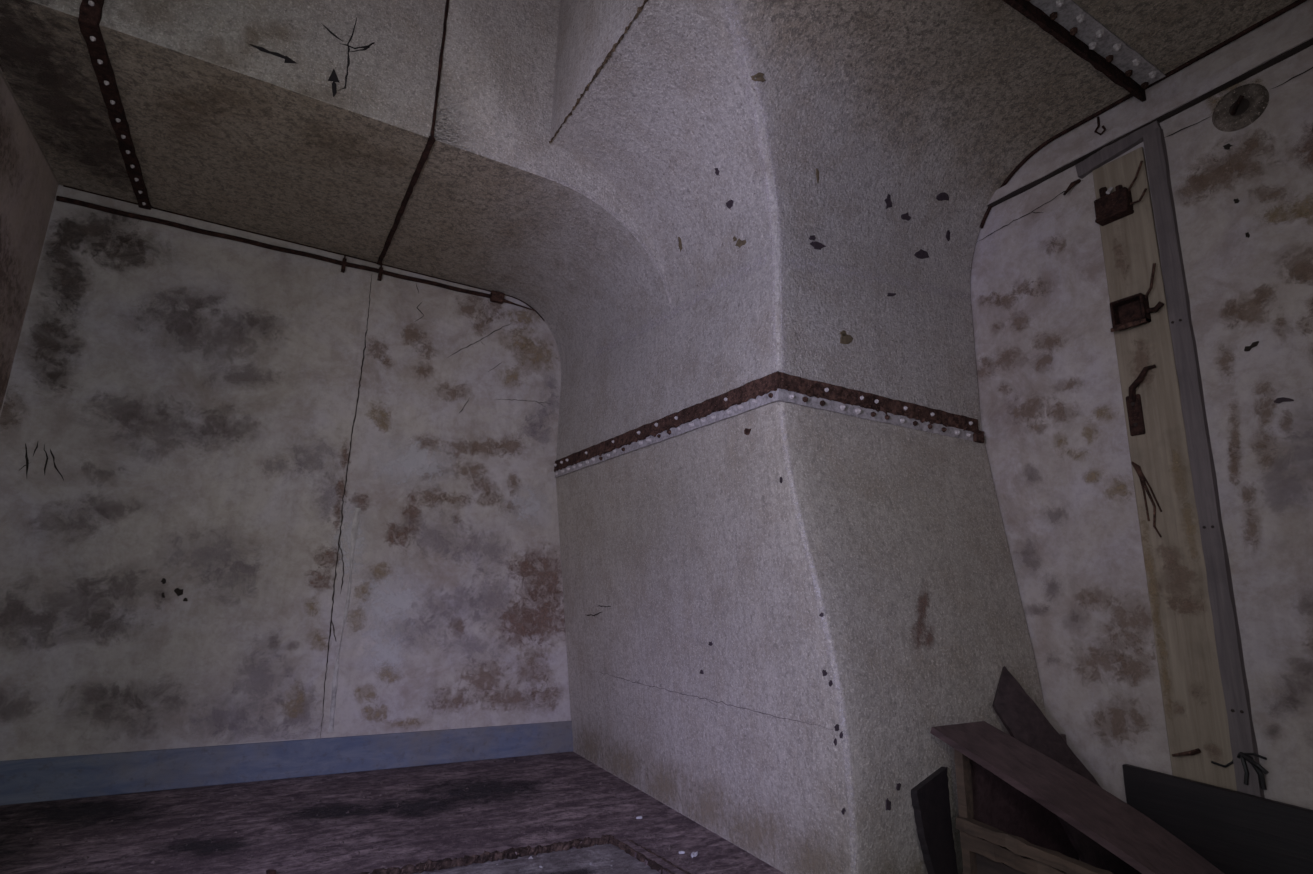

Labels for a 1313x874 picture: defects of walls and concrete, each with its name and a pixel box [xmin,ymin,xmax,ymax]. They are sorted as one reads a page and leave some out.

damp [32,213,149,387]
crack [320,276,372,736]
damp [452,440,519,456]
damp [1229,406,1258,542]
damp [434,654,558,710]
damp [1079,536,1204,712]